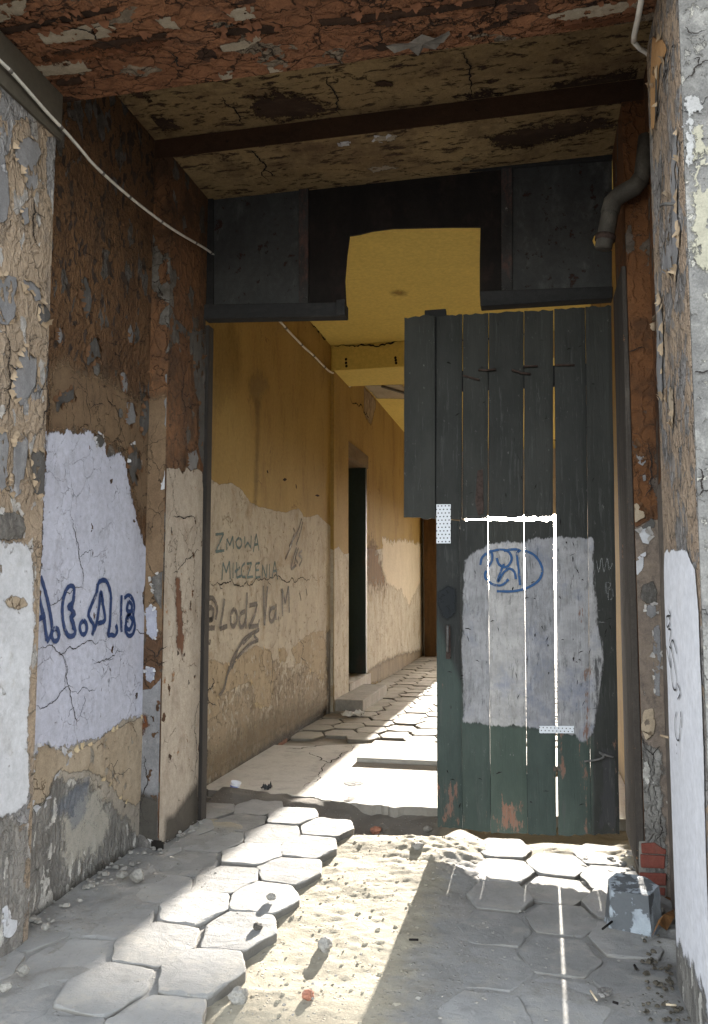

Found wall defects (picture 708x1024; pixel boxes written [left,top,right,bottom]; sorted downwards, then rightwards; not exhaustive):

peeling [0,0,184,89]
peeling [212,5,283,56]
crack [463,53,473,96]
peeling [660,127,680,282]
peeling [0,269,63,348]
peeling [8,343,40,406]
peeling [650,292,674,428]
spalling [118,368,149,487]
peeling [0,426,45,541]
crack [52,514,92,605]
peeling [634,502,663,696]
crack [39,629,167,729]